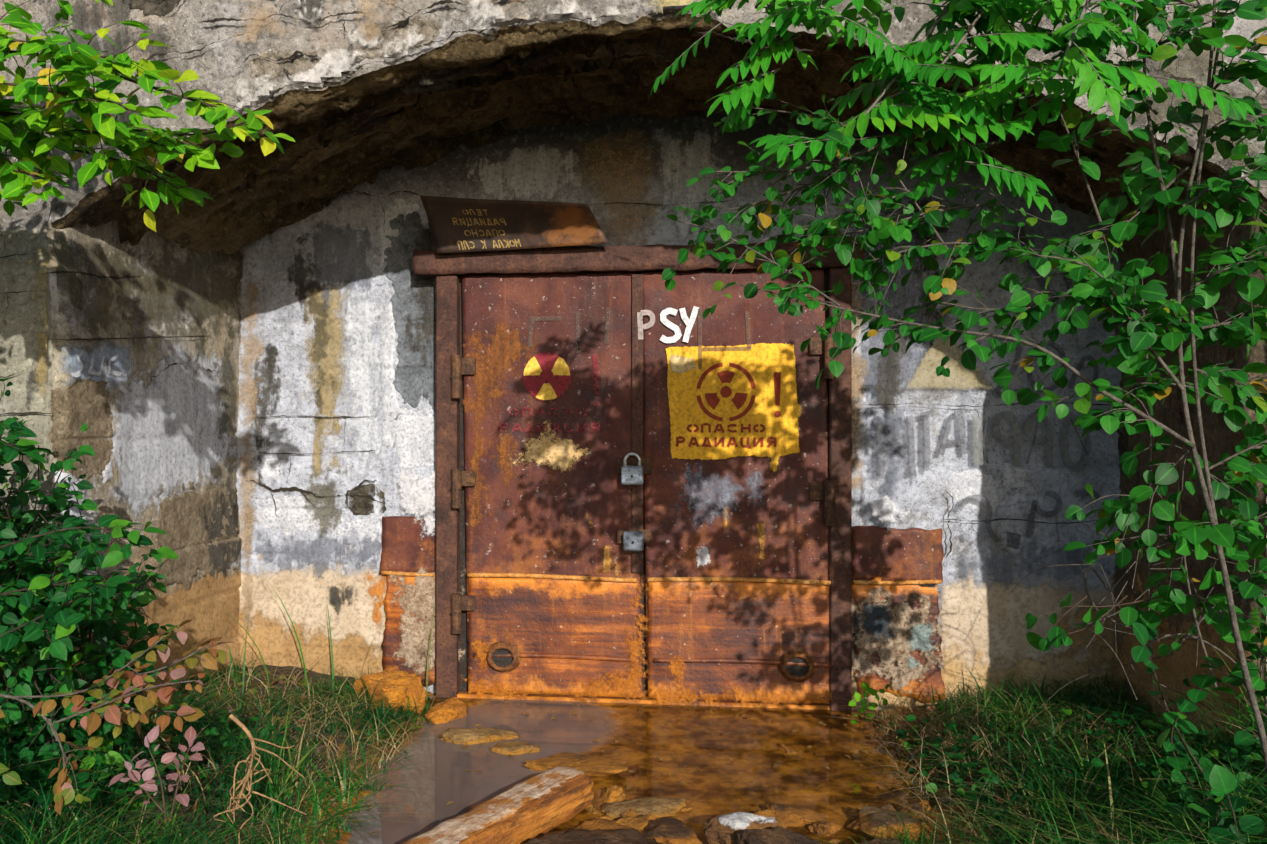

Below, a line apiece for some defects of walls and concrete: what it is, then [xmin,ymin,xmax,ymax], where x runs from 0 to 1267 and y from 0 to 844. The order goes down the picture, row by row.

spalling [247,17,443,88]
water stain [406,227,436,367]
water stain [288,222,388,522]
corrosion [463,322,535,526]
water stain [59,469,87,520]
water stain [82,312,436,704]
spalling [146,457,386,590]
corrosion [603,546,618,575]
corrosion [465,640,527,700]
corrosion [572,584,831,707]